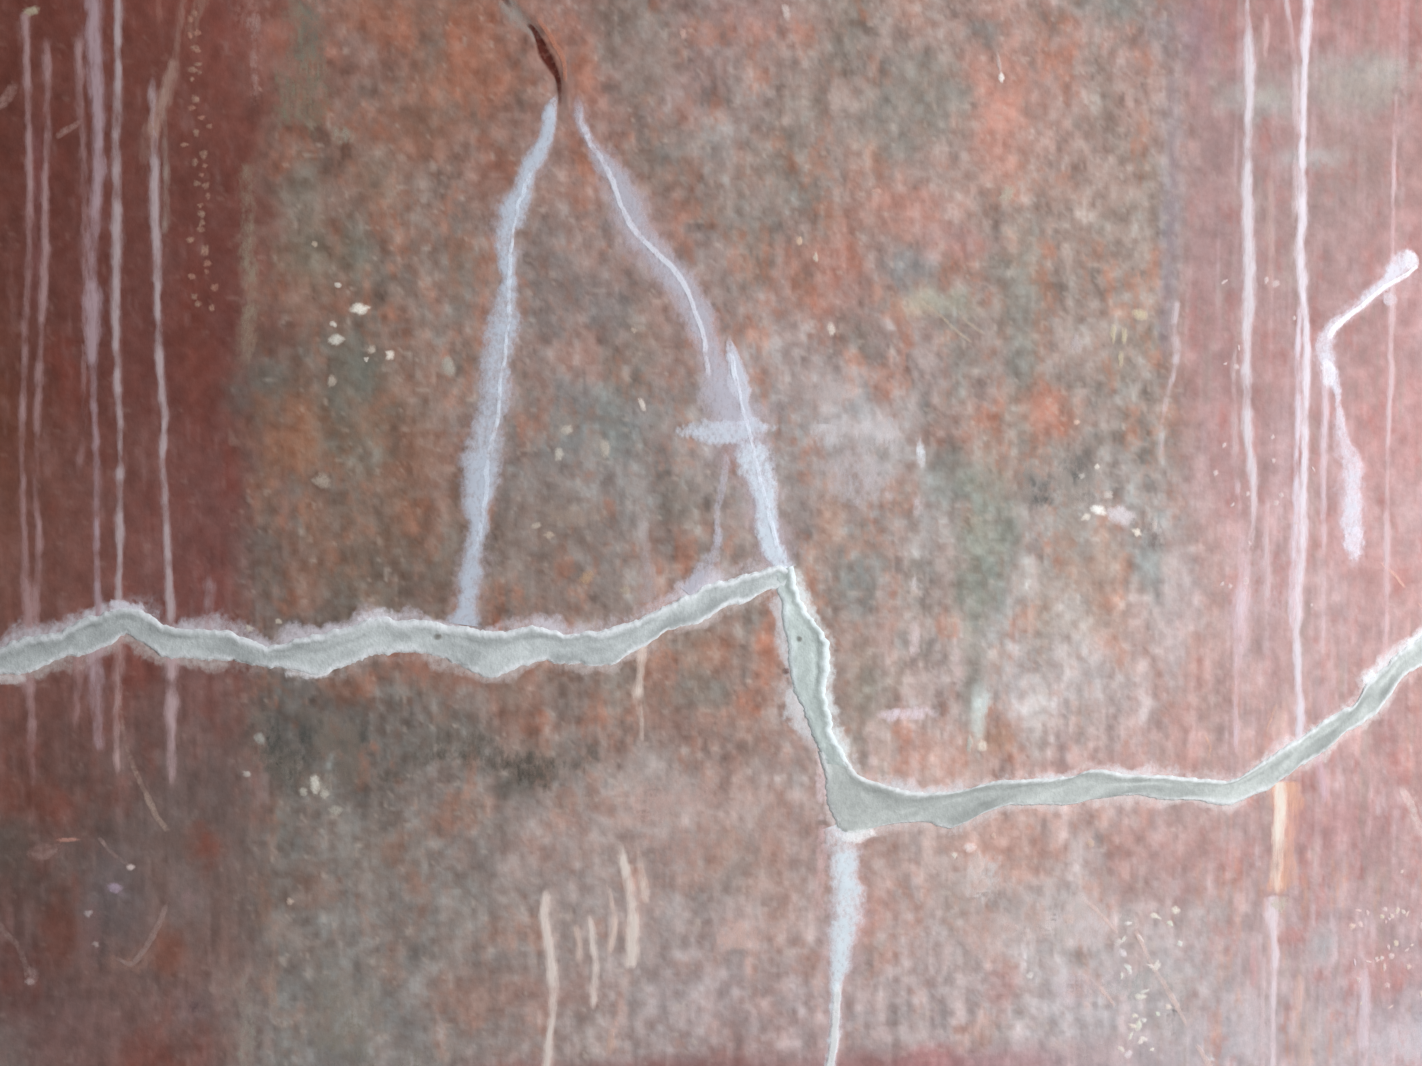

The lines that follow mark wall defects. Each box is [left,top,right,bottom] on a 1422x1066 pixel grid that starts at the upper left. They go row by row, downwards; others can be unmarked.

damp [22,8,50,89]
crack [501,0,567,93]
damp [26,124,49,321]
damp [76,0,121,363]
damp [151,156,167,320]
damp [1242,22,1272,384]
damp [95,511,123,616]
damp [156,346,167,458]
damp [164,524,174,622]
crack [0,105,1422,842]
damp [1285,0,1328,740]
crack [826,850,861,1066]